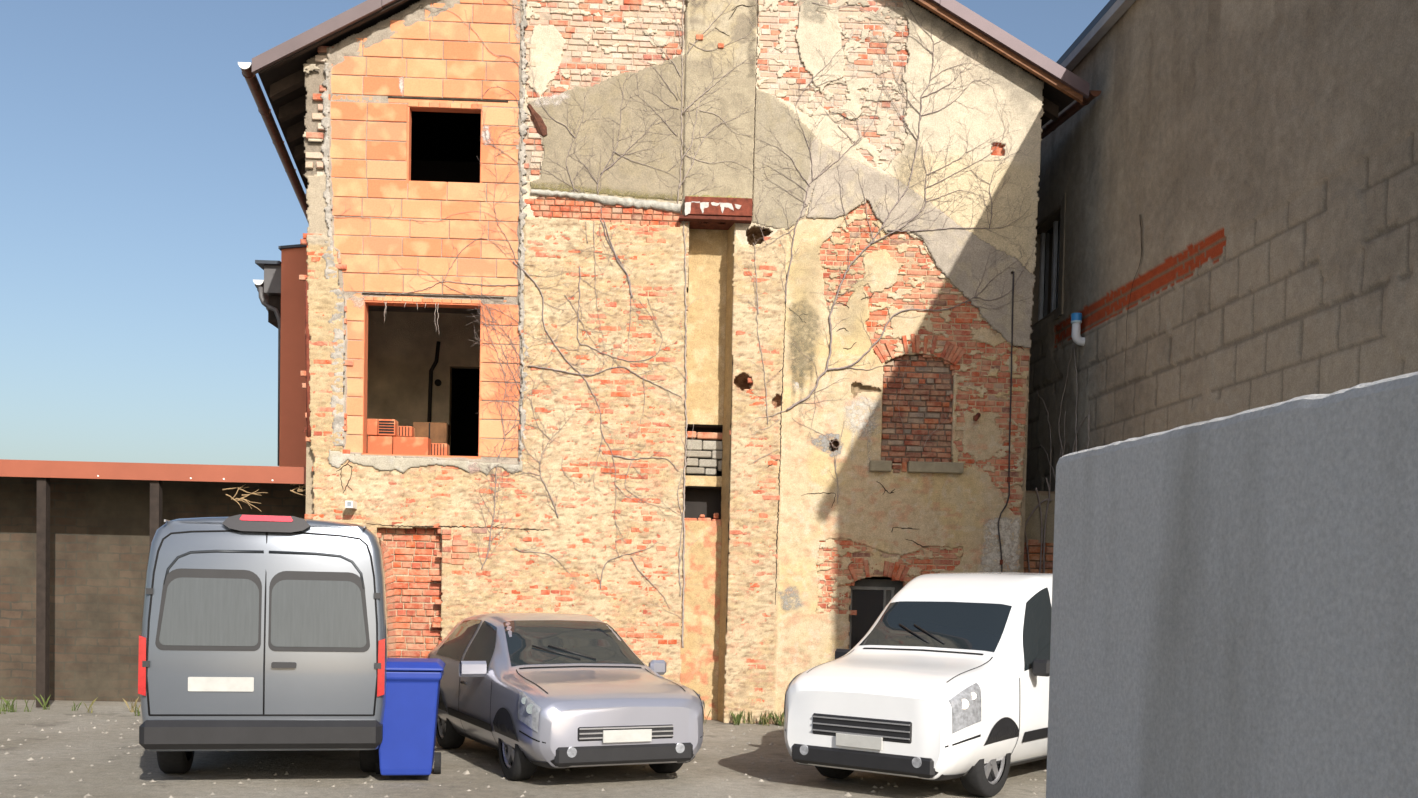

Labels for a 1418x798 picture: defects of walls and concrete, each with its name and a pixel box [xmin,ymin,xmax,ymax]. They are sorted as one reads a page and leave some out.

flaking render [514,0,687,181]
flaking render [755,0,909,171]
flaking render [524,196,742,227]
flaking render [819,201,1031,515]
peeling [328,450,523,474]
flaking render [815,537,964,615]